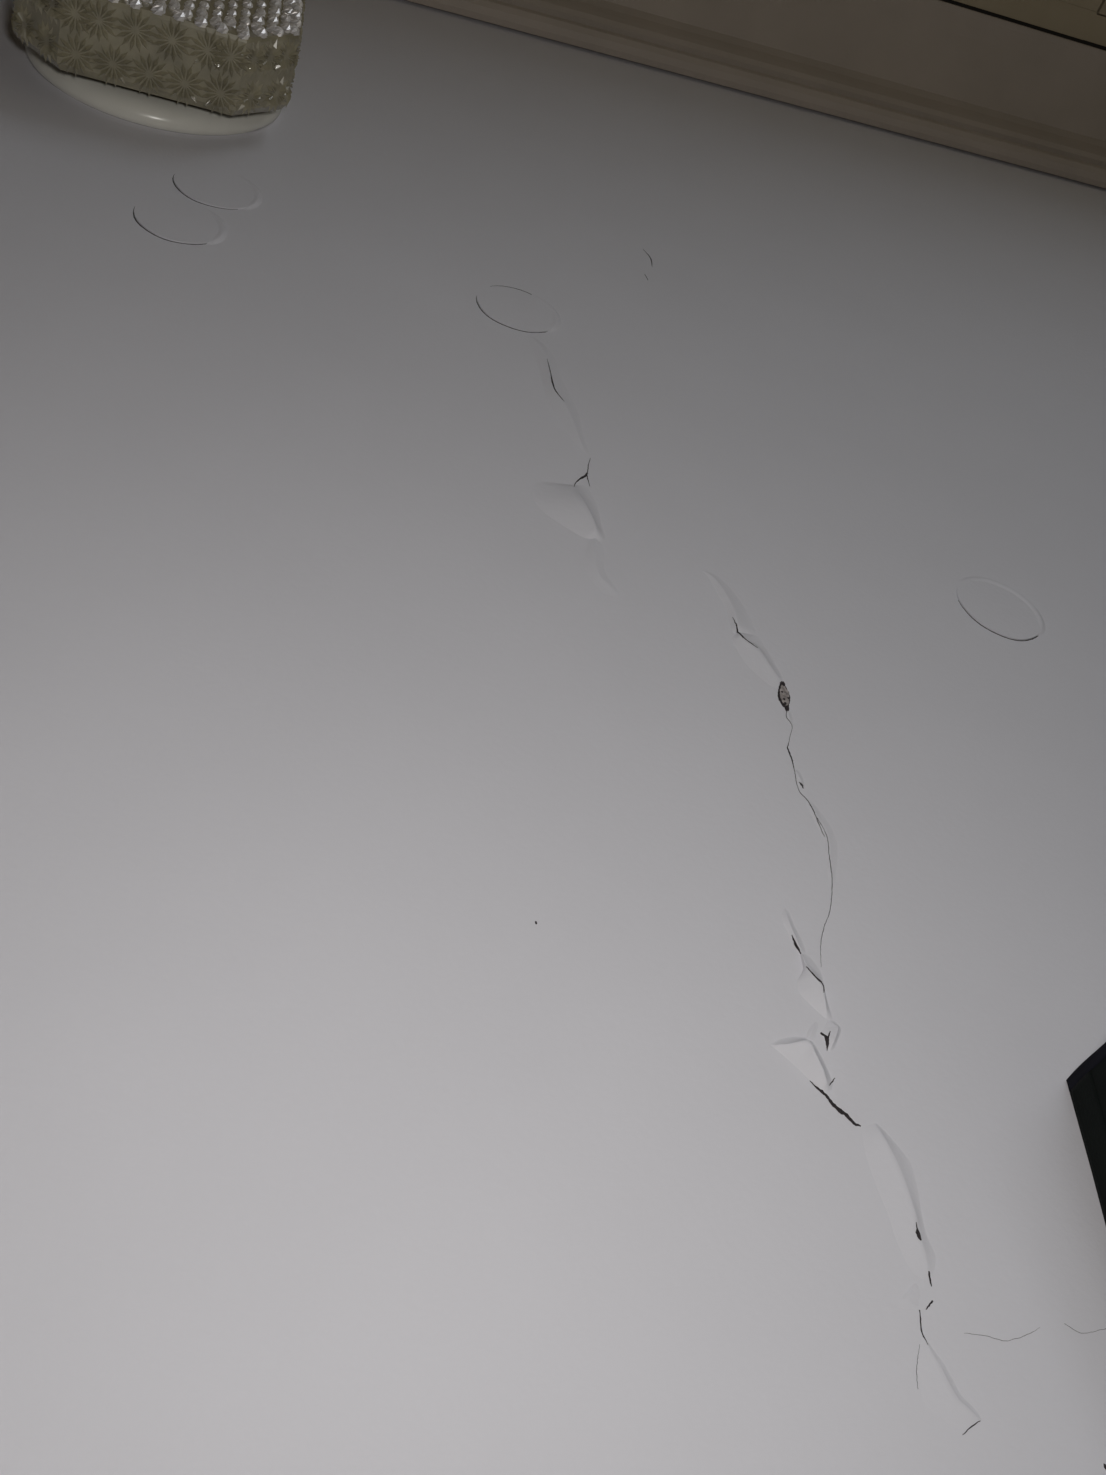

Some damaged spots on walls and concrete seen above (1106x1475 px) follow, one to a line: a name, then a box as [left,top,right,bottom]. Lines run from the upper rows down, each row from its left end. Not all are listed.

spalling [778,681,790,711]
crack [701,570,982,1435]